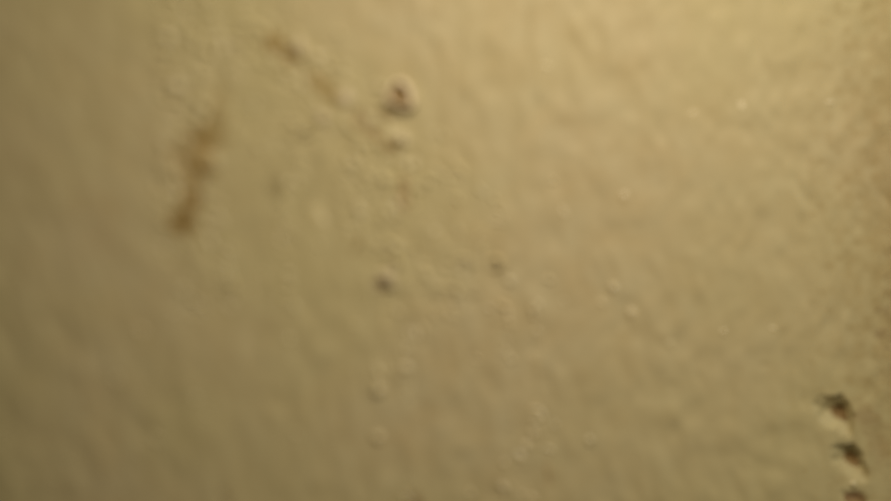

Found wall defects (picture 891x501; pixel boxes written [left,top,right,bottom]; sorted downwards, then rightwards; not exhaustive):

peeling [808,393,870,501]